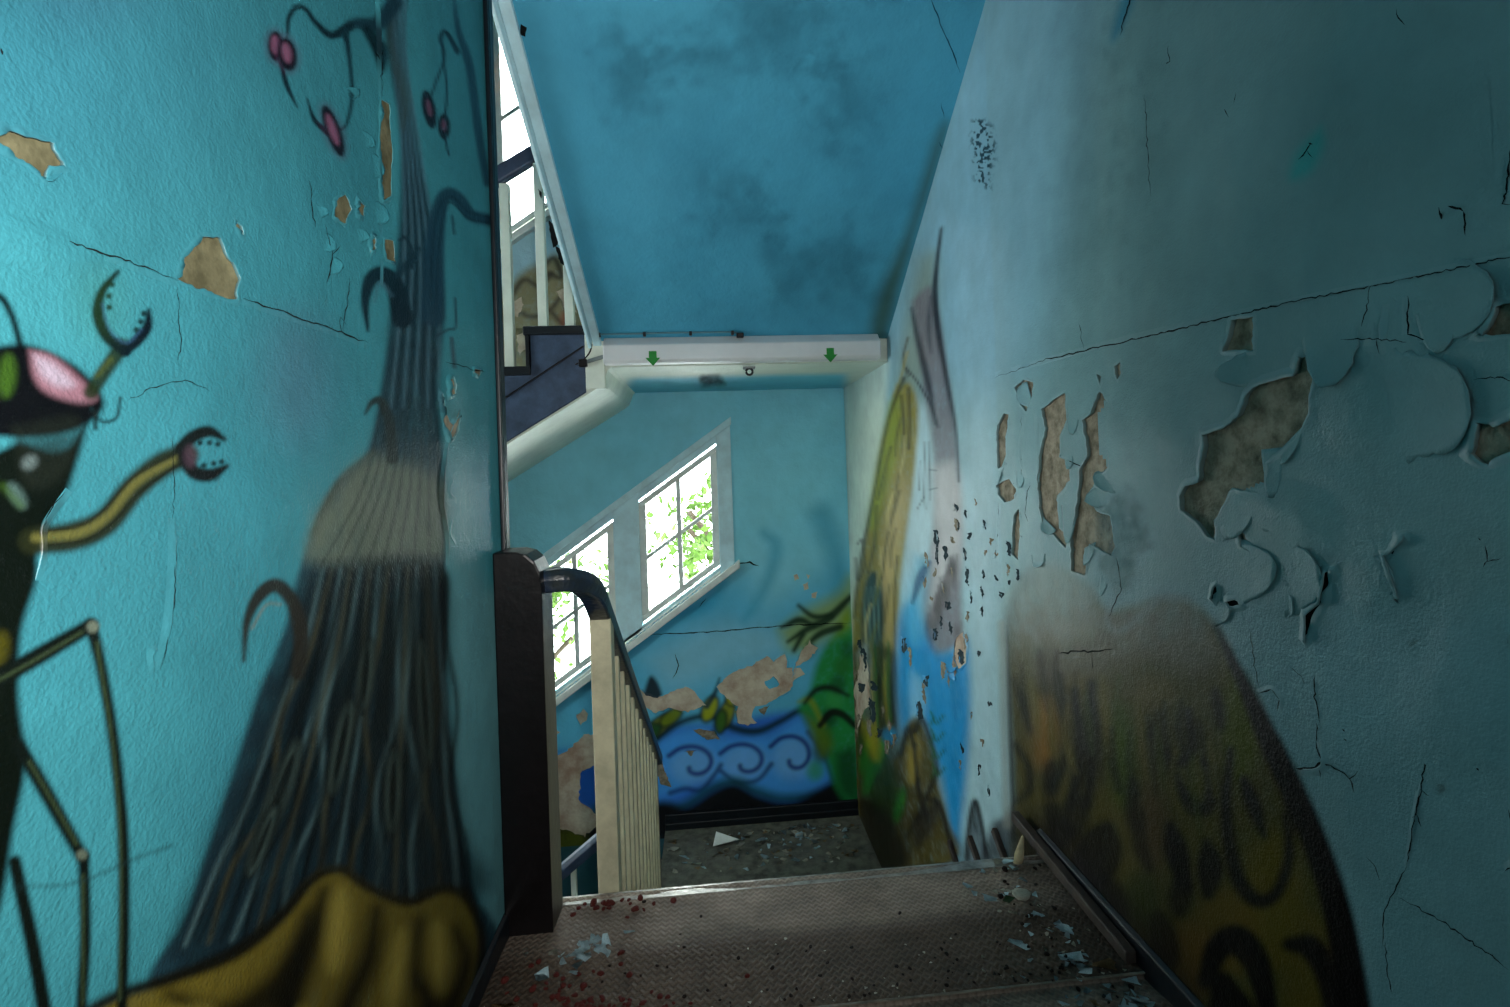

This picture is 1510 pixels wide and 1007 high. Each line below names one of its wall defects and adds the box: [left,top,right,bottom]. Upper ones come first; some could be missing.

peeling [0,120,70,185]
leakage [972,120,995,187]
crack [1502,151,1510,205]
crack [70,241,208,398]
peeling [173,217,246,307]
crack [995,206,1510,378]
peeling [1394,258,1510,469]
peeling [901,359,1123,720]
peeling [1176,310,1359,649]
peeling [638,639,819,757]
peeling [853,640,897,755]
crack [1370,764,1507,992]